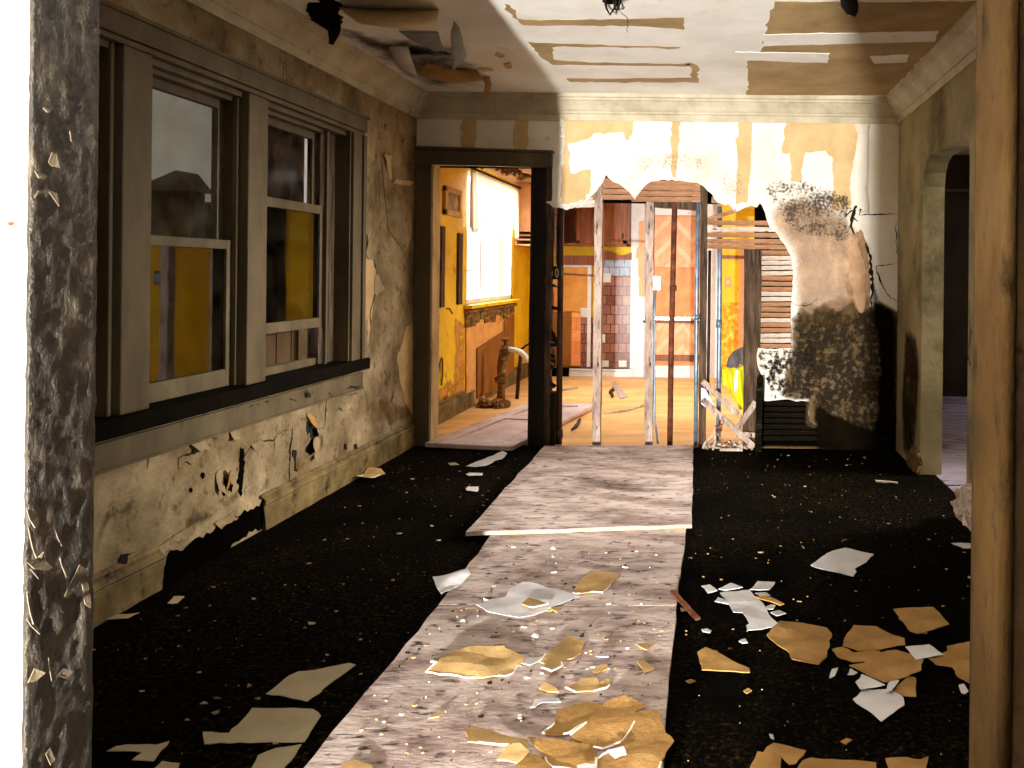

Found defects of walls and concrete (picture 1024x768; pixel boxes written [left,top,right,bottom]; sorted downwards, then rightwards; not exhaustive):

flaking render [505,4,685,30]
flaking render [528,42,700,83]
flaking render [746,1,976,95]
flaking render [547,120,634,210]
flaking render [727,122,752,213]
flaking render [782,123,857,211]
peeling [365,231,385,346]
damp [758,182,919,453]
crack [845,205,898,306]
crack [178,440,208,469]
crack [250,398,296,481]
spalling [157,500,263,586]